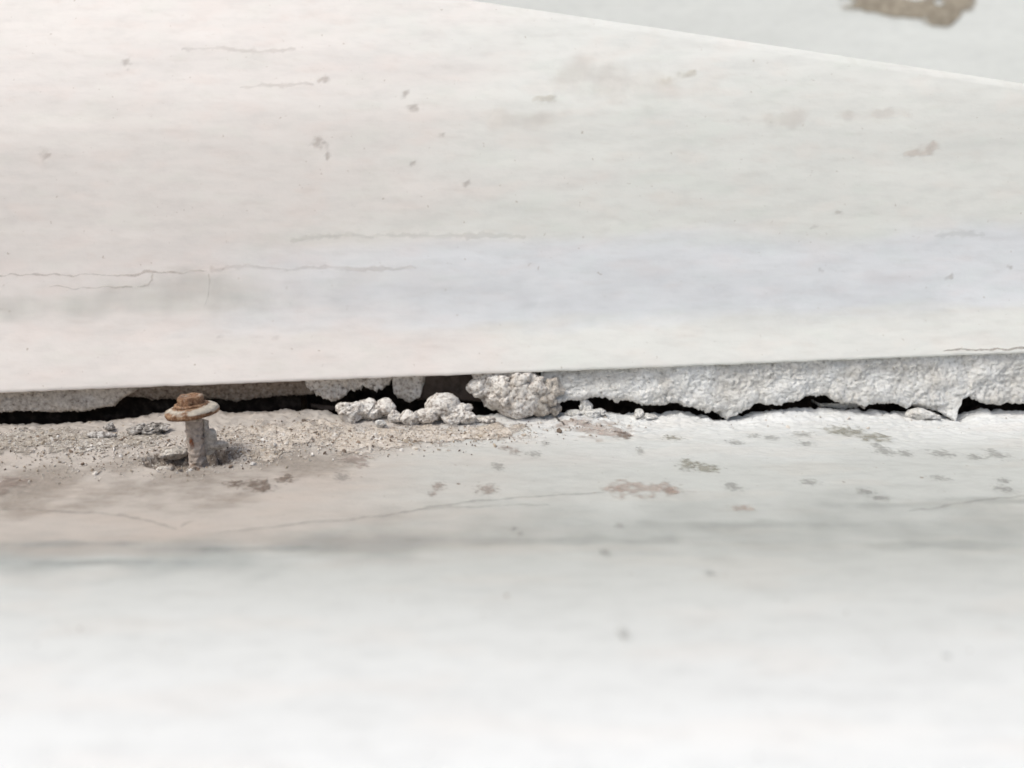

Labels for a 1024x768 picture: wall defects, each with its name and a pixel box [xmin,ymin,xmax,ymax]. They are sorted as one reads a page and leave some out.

spalling [541,353,1024,421]